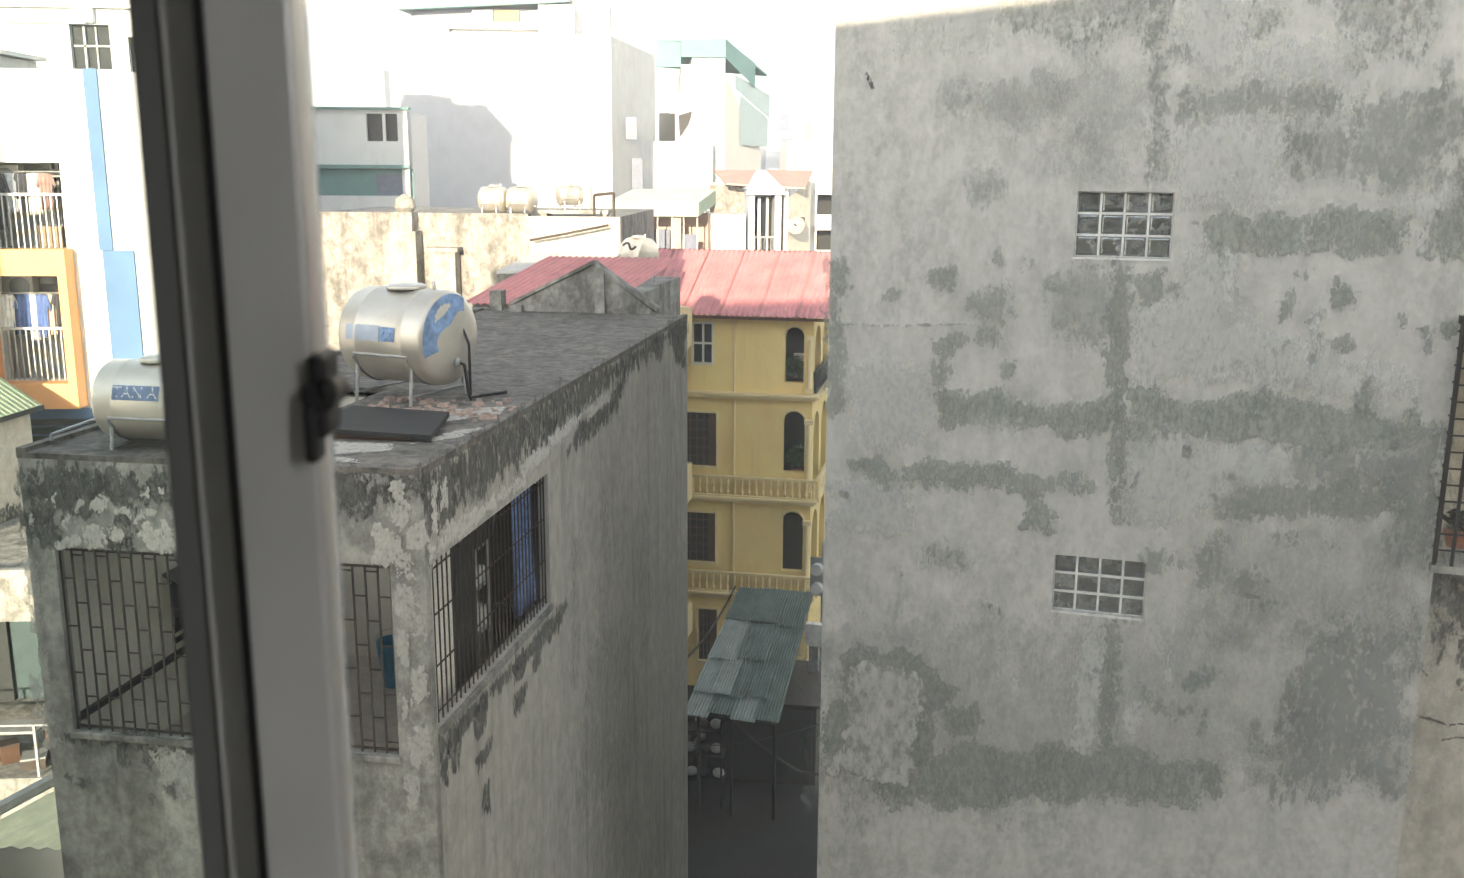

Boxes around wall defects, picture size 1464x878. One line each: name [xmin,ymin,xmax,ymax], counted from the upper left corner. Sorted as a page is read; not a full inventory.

peeling [21,558,62,750]
leakage [0,460,171,555]
peeling [46,487,175,555]
peeling [334,427,481,463]
peeling [370,393,612,811]
leakage [336,316,689,536]